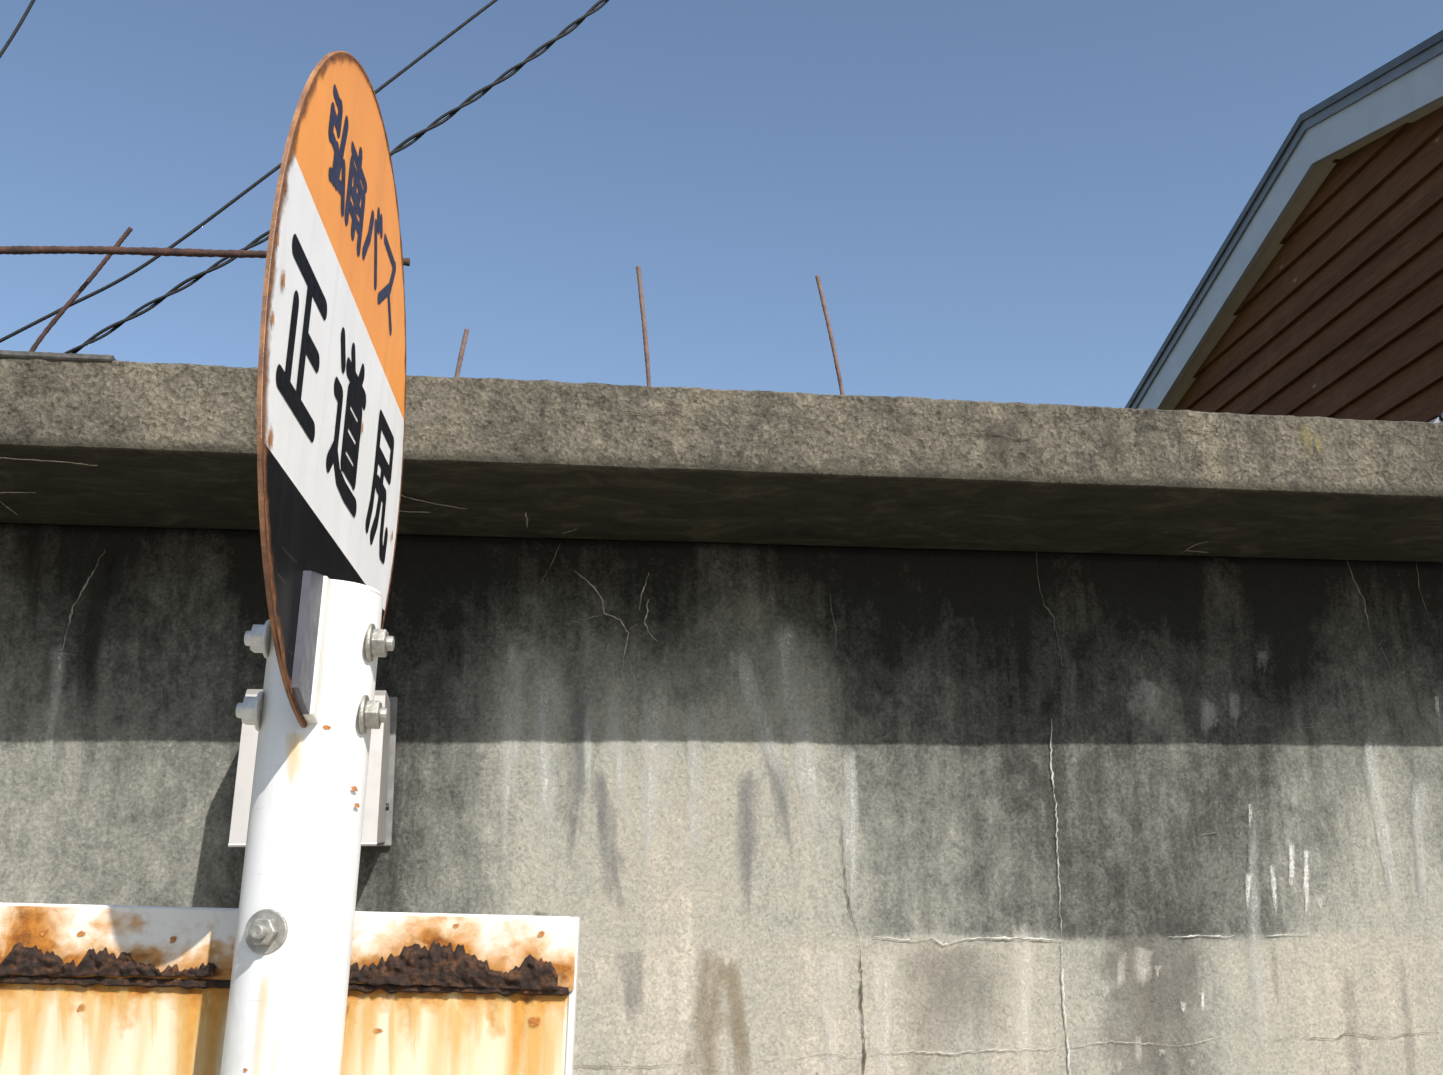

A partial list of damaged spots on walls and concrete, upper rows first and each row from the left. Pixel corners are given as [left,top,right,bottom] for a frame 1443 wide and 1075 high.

crack [0,457,97,514]
crack [541,529,657,691]
crack [1036,553,1062,663]
water stain [845,760,855,886]
crack [797,719,1224,1075]
crack [1170,932,1234,940]
water stain [1246,846,1308,906]
water stain [701,962,747,1075]